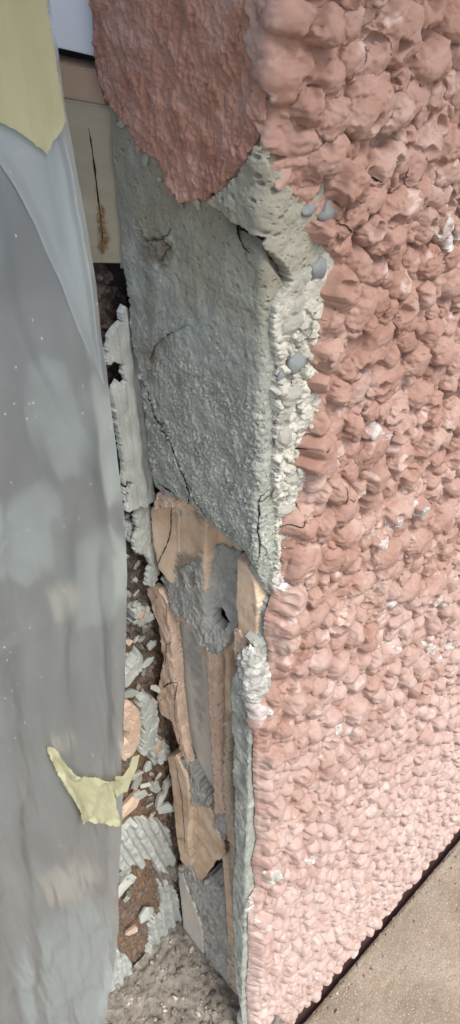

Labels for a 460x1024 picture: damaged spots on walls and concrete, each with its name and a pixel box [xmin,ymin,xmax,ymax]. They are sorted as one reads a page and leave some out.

rust [97,205,108,253]
crack [237,225,278,267]
crack [143,384,206,563]
crack [256,493,312,562]
spalling [105,101,336,1024]